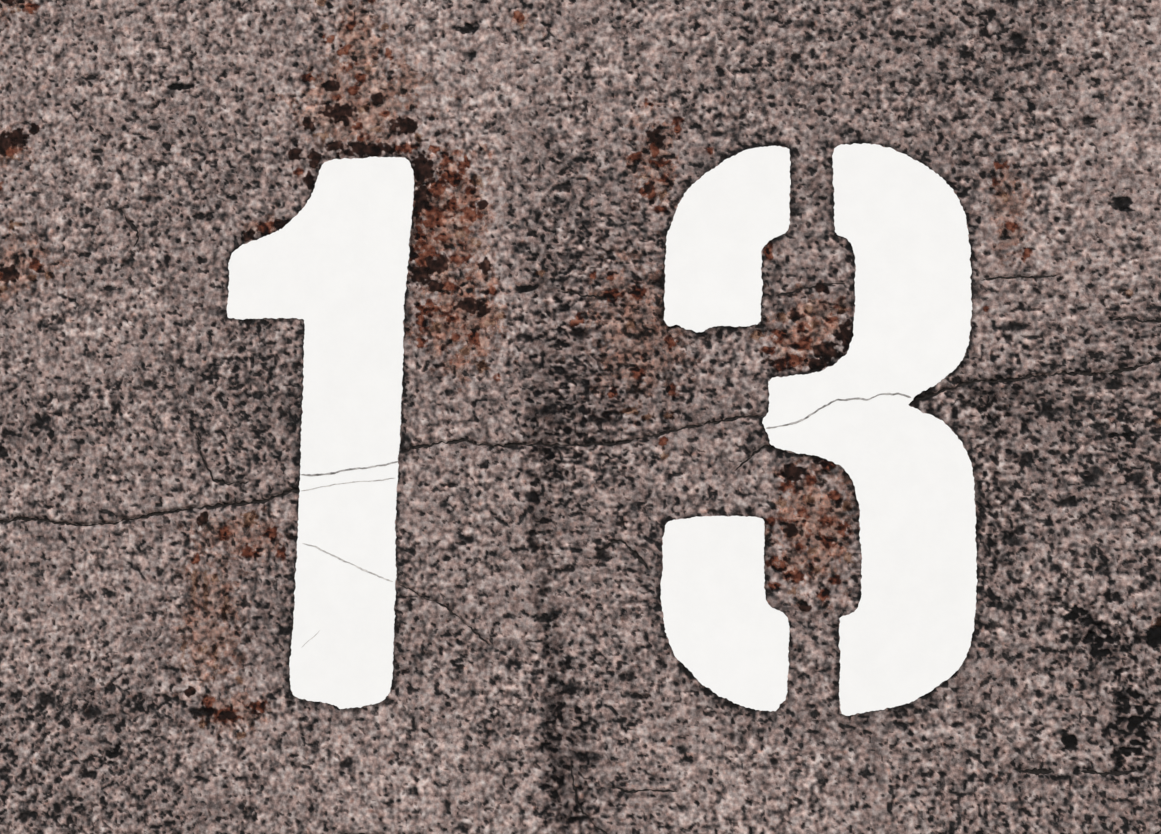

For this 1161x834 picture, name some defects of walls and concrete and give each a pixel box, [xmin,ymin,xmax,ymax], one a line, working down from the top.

corrosion [0,123,40,191]
corrosion [241,214,289,241]
corrosion [278,0,508,391]
corrosion [763,241,773,260]
corrosion [751,281,854,373]
crack [1110,315,1161,323]
crack [0,359,1161,526]
corrosion [764,455,860,612]
crack [570,761,607,834]
crack [609,786,677,794]